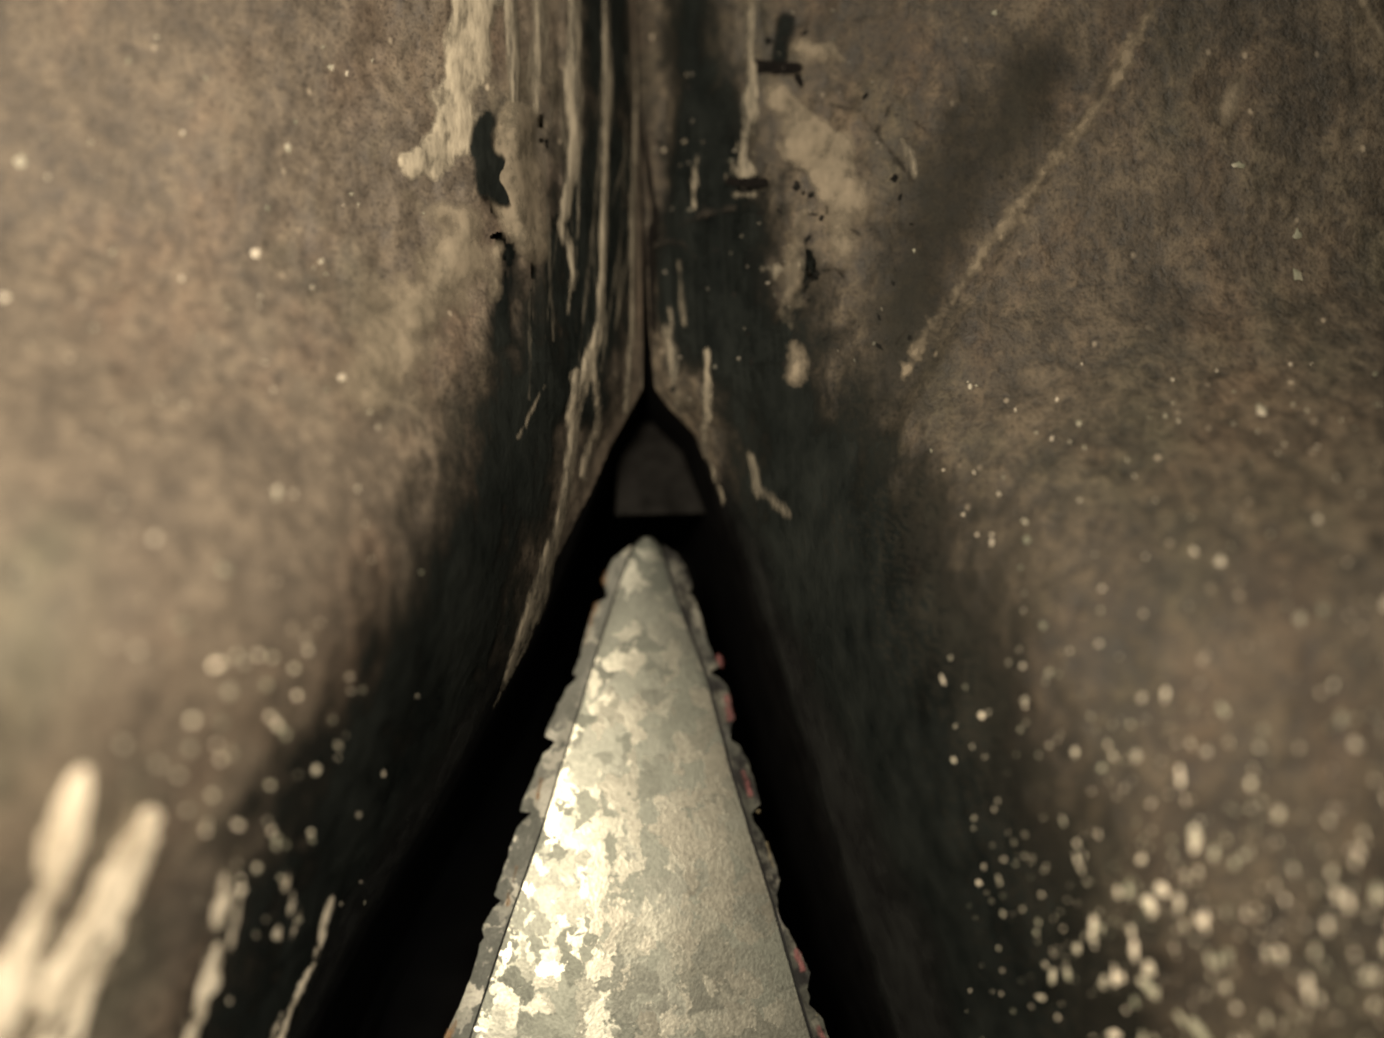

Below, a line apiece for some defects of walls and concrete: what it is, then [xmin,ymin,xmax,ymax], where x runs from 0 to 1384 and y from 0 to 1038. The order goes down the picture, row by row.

damp [179,0,642,1038]
damp [655,0,1141,1038]